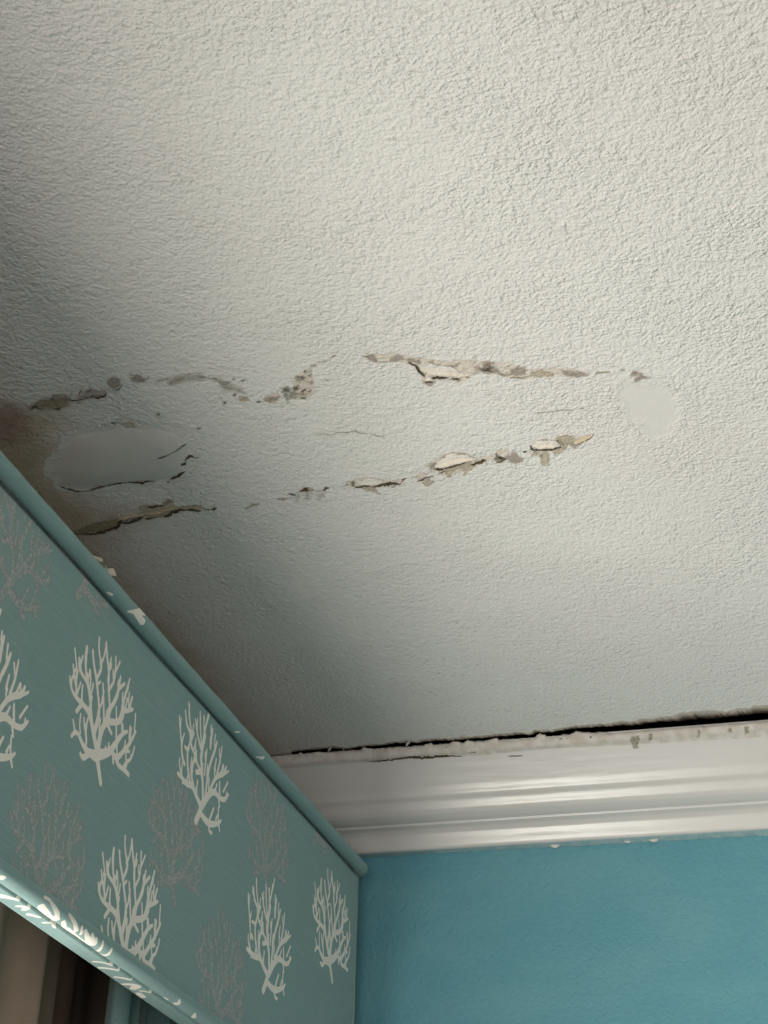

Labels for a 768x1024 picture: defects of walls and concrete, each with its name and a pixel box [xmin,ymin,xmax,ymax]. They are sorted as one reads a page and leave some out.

peeling [25,356,335,420]
peeling [361,353,648,386]
peeling [278,435,594,501]
crack [272,705,768,765]